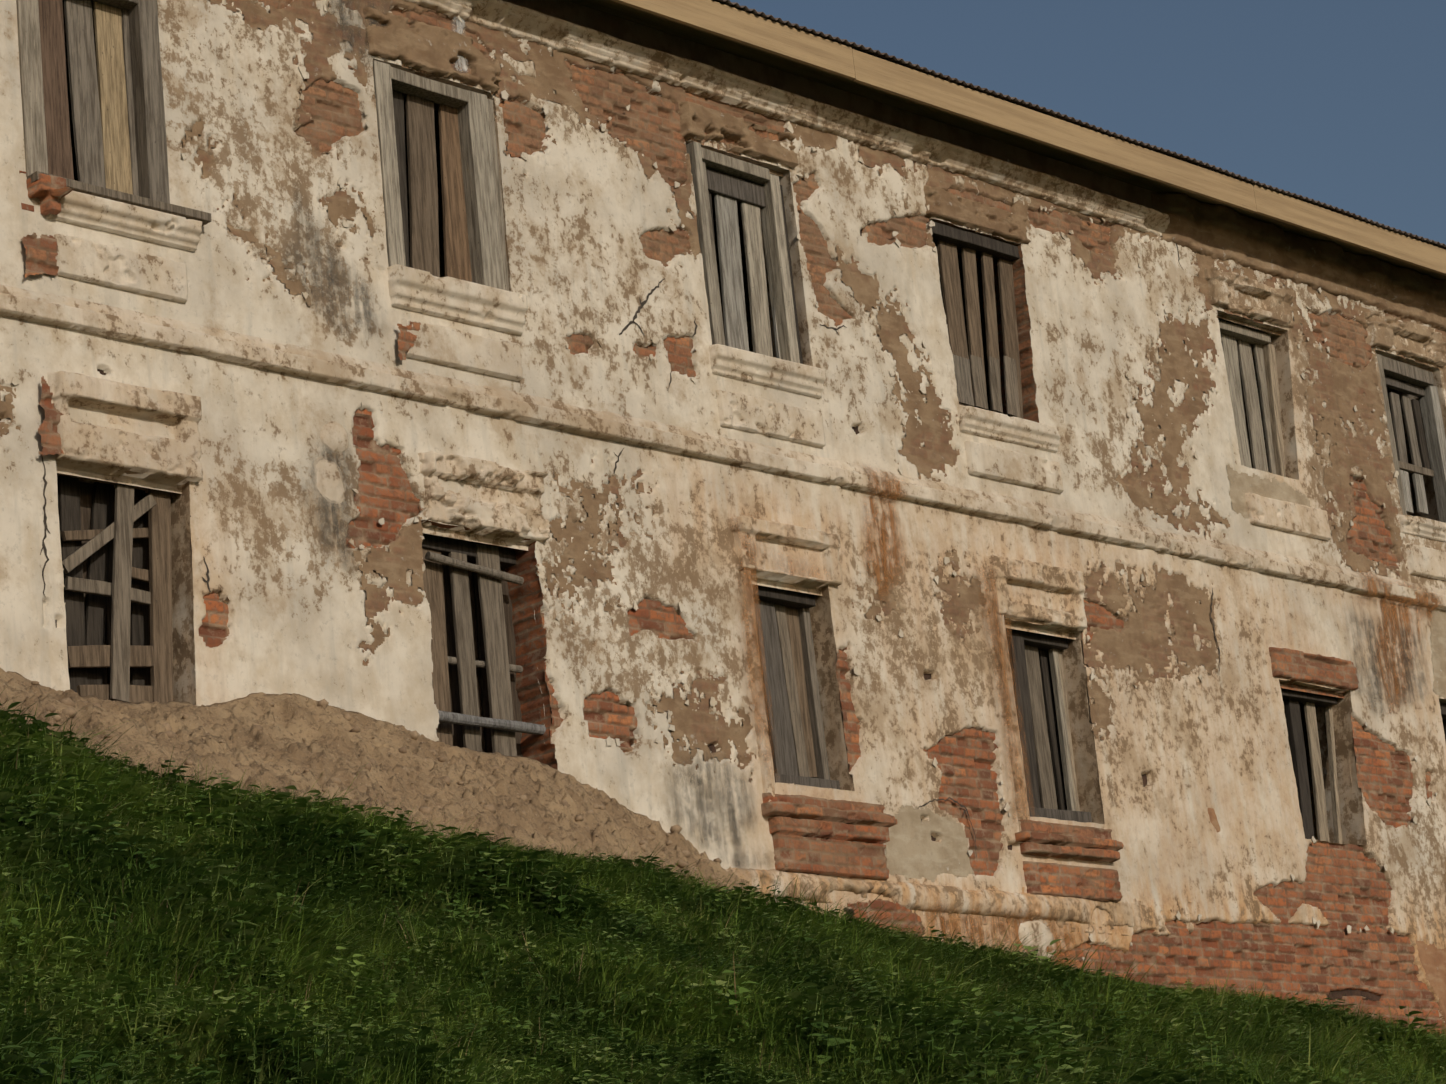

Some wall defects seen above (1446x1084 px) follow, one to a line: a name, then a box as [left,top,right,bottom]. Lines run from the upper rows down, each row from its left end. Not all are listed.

peeling [217,194,316,306]
crack [619,278,665,336]
flaking render [633,336,698,384]
peeling [793,171,960,482]
peeling [1115,252,1446,577]
crack [40,454,51,596]
flaking render [346,402,424,666]
peeling [537,459,693,641]
peeling [1081,559,1221,746]
flaking render [923,727,1012,876]
flaking render [1350,714,1438,828]
flaking render [1035,836,1446,1037]